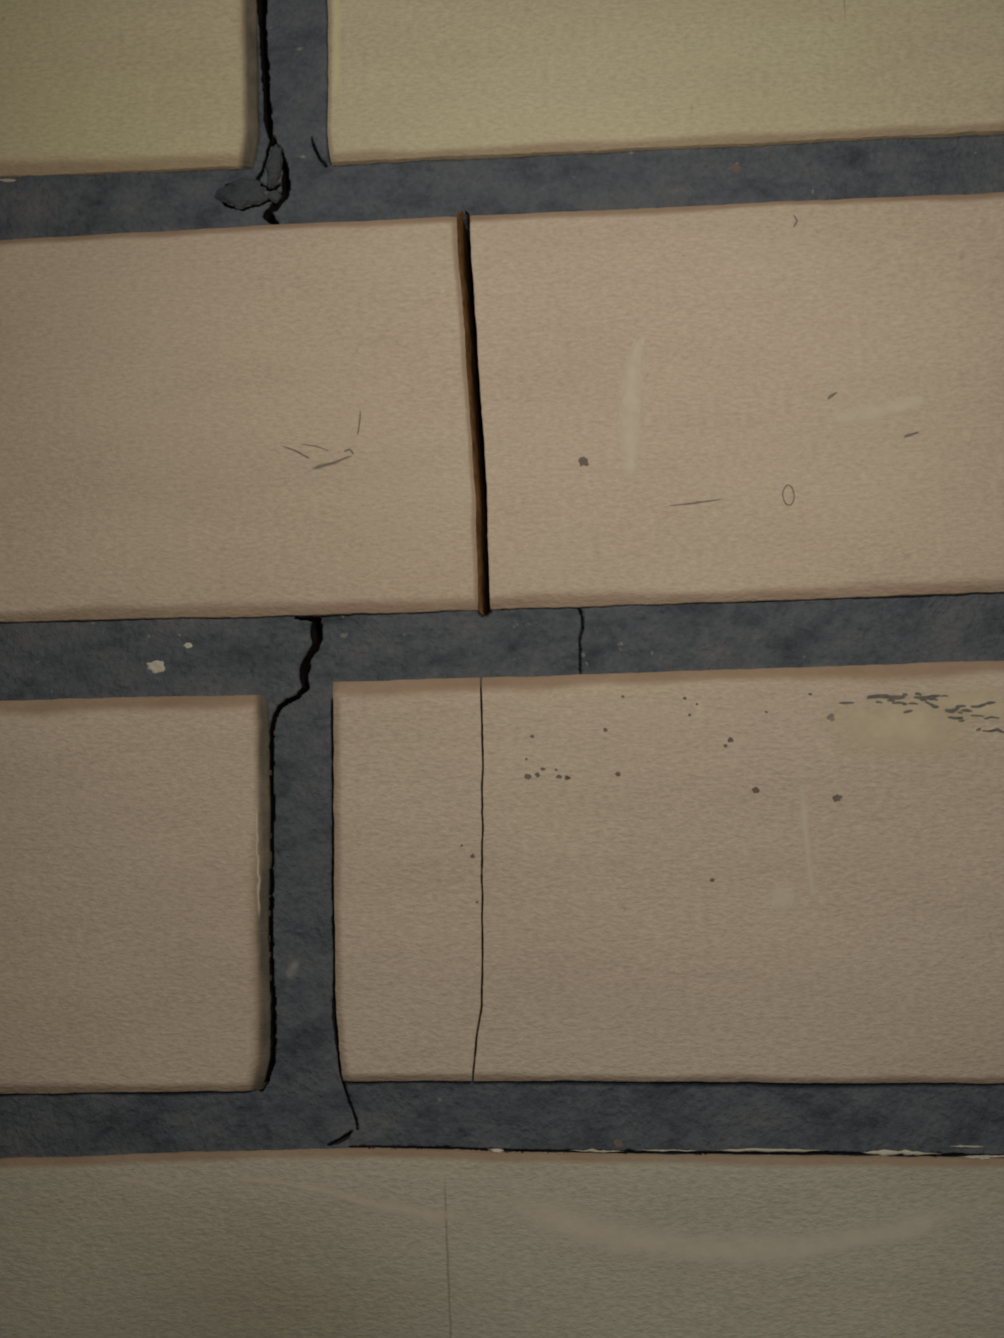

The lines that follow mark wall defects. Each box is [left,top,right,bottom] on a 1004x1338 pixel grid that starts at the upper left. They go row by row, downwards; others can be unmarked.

crack [223,0,327,225]
crack [457,210,492,616]
crack [261,610,980,1159]